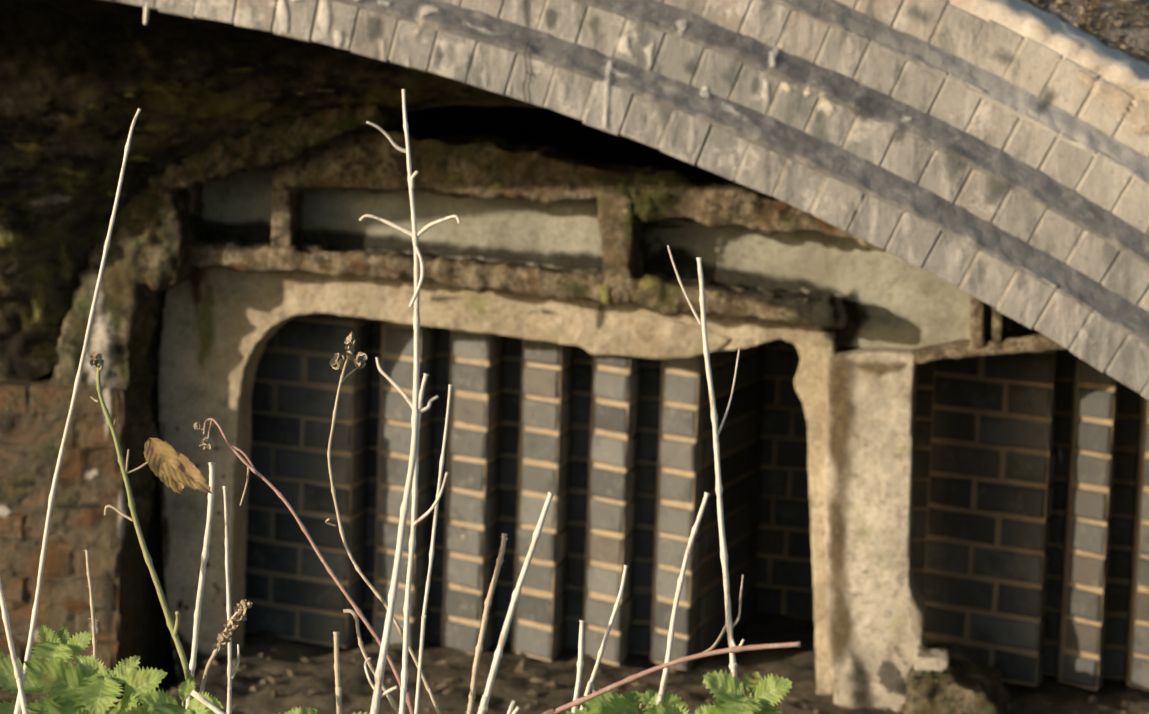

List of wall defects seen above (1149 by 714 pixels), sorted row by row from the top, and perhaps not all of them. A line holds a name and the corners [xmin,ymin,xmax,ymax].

crack [522,0,534,103]
leakage [27,194,74,207]
leakage [0,307,26,379]